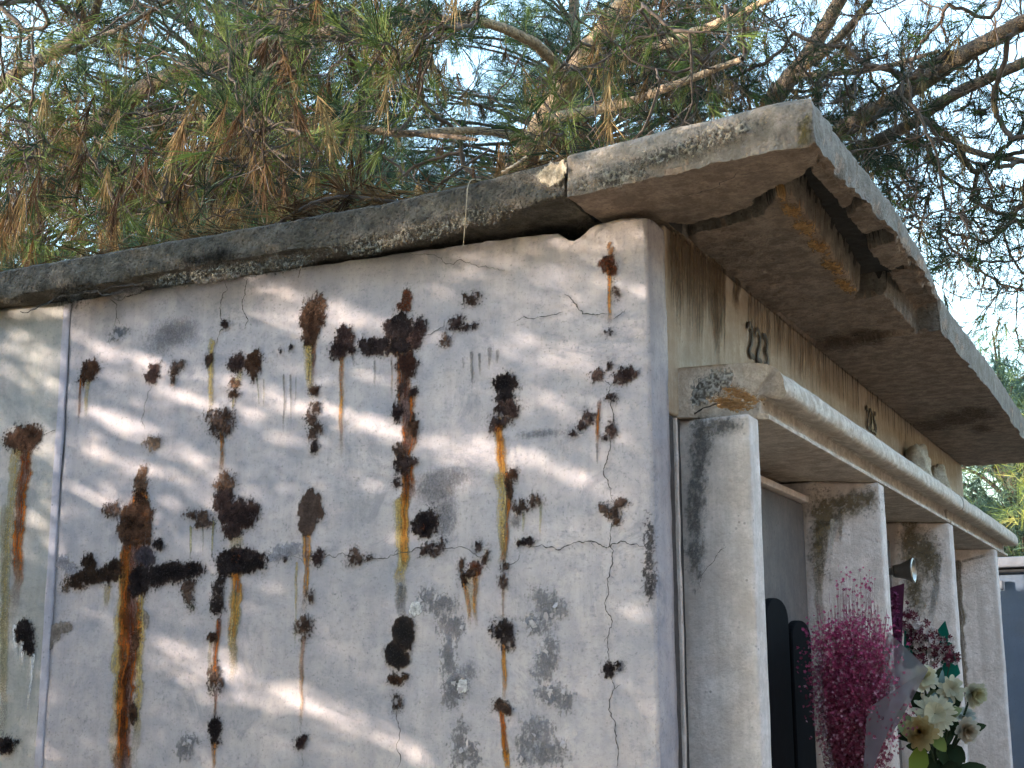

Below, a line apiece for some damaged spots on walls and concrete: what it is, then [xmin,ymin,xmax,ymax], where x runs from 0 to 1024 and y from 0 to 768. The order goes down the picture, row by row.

crack [515,294,626,322]
corrosion [597,242,620,316]
leakage [670,228,994,441]
corrosion [0,422,43,693]
corrosion [62,338,271,768]
corrosion [278,287,447,712]
crack [294,381,647,766]
corrosion [457,371,541,768]
leakage [641,518,658,600]
leakage [686,417,743,592]
leakage [808,486,880,610]
leakage [446,666,474,698]